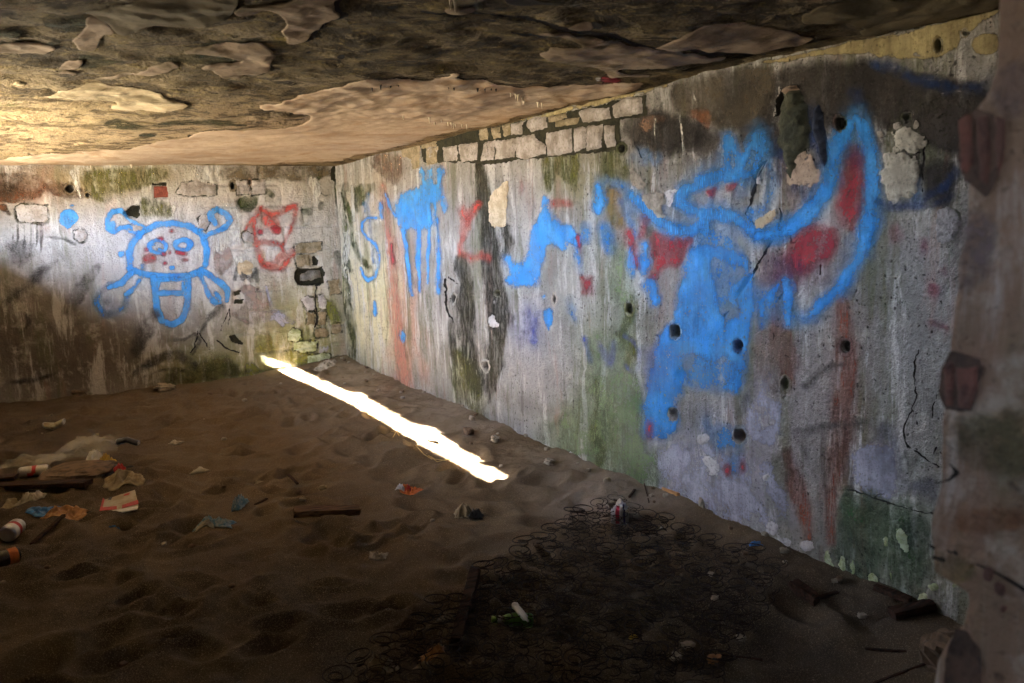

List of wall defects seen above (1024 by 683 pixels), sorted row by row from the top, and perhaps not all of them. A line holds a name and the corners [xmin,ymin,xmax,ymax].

peeling [38,0,340,113]
peeling [0,22,814,182]
spalling [785,151,821,188]
peeling [876,120,919,138]
damp [448,162,514,403]
crack [885,349,959,484]